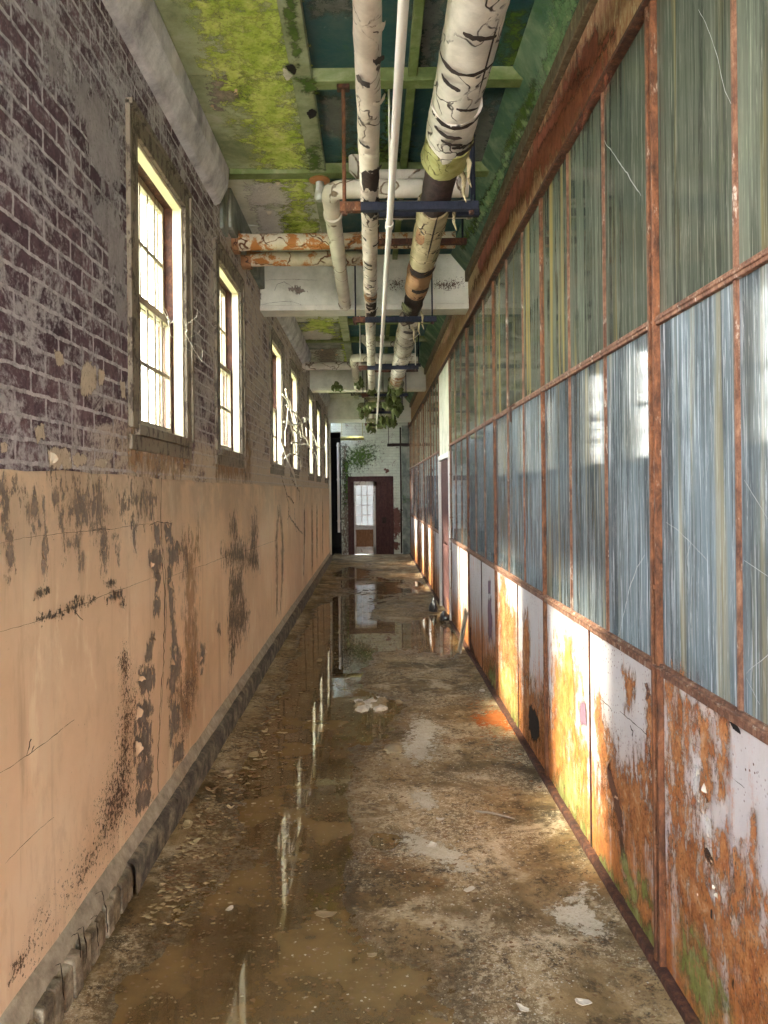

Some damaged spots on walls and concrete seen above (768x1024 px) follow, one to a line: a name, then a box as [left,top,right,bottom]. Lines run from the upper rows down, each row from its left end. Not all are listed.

leakage [222,9,354,142]
leakage [308,0,353,18]
leakage [409,0,448,67]
leakage [469,98,501,161]
rust [473,26,616,284]
peeling [54,349,64,367]
peeling [34,423,109,470]
peeling [80,362,105,400]
leakage [0,430,191,628]
leakage [178,531,199,721]
leakage [217,512,261,675]
rust [446,574,768,1024]